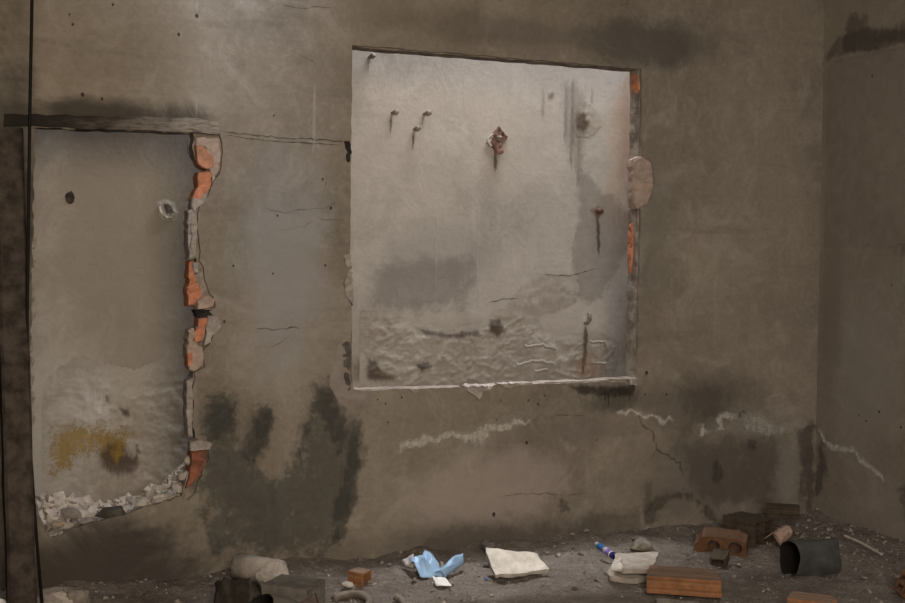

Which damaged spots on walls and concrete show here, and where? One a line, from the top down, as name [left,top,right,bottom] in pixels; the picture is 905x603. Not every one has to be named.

peeling [192,135,221,185]
peeling [157,199,199,274]
damp [50,420,133,476]
spalling [30,295,226,503]
efflorescence [400,419,529,450]
damp [618,409,671,425]
efflorescence [700,413,788,436]
damp [819,430,884,481]